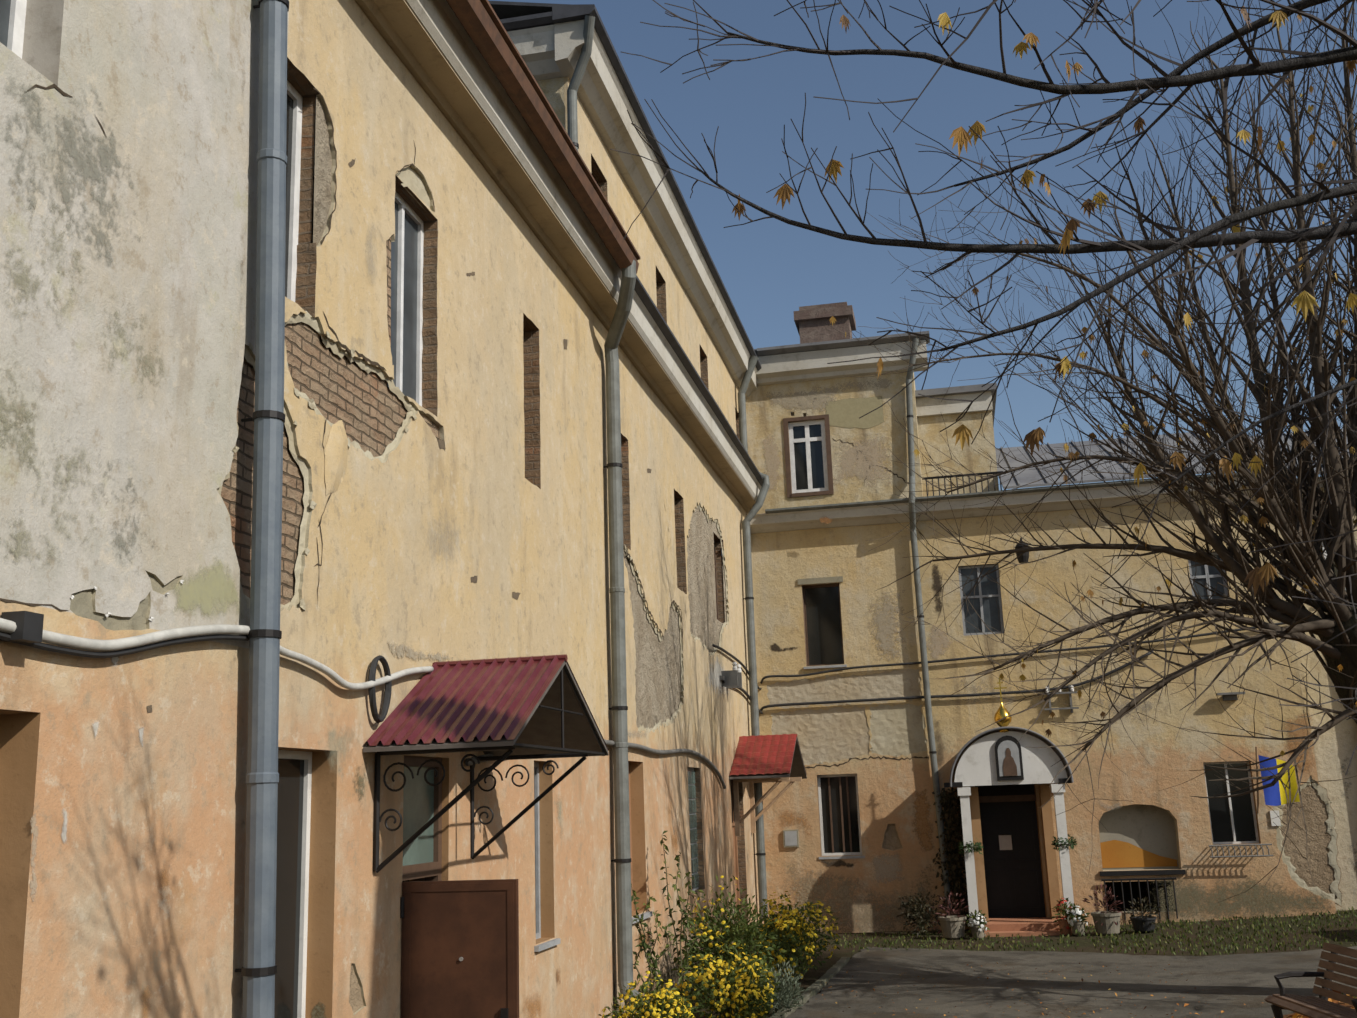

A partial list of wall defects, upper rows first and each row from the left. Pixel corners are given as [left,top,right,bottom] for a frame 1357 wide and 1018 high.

mould [7,89,133,272]
spalling [310,87,332,245]
spalling [217,342,255,608]
spalling [280,407,317,610]
spalling [285,311,446,463]
peeling [70,573,184,631]
spalling [624,501,728,732]
spalling [1273,775,1342,907]